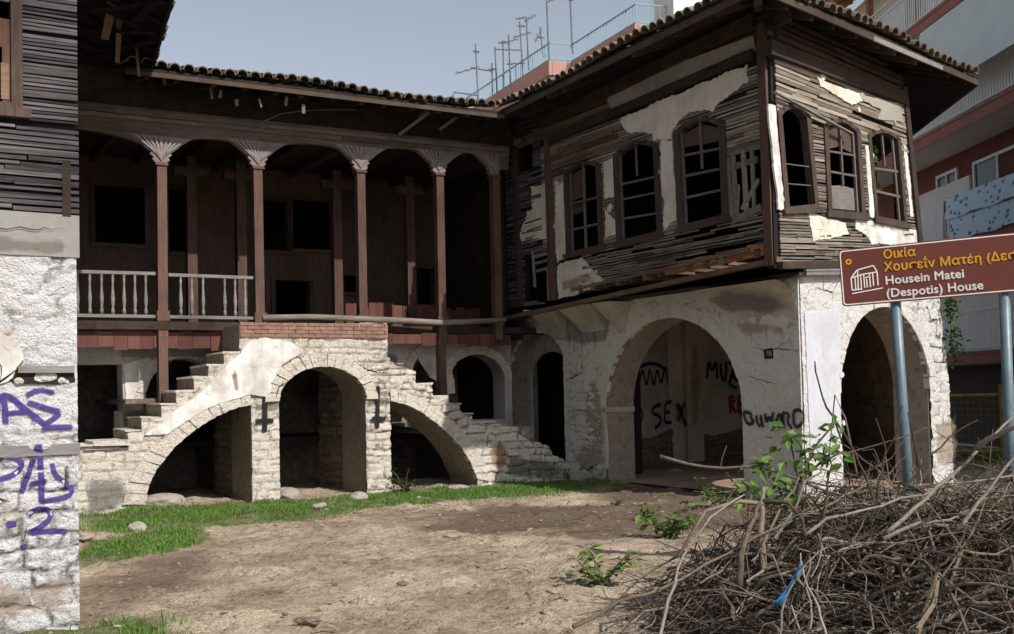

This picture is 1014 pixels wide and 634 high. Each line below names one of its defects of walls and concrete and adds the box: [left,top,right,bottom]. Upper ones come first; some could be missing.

crack [0,224,60,232]
flaking render [607,36,756,231]
flaking render [766,104,785,210]
flaking render [816,74,903,124]
flaking render [807,144,917,245]
spalling [0,332,75,384]